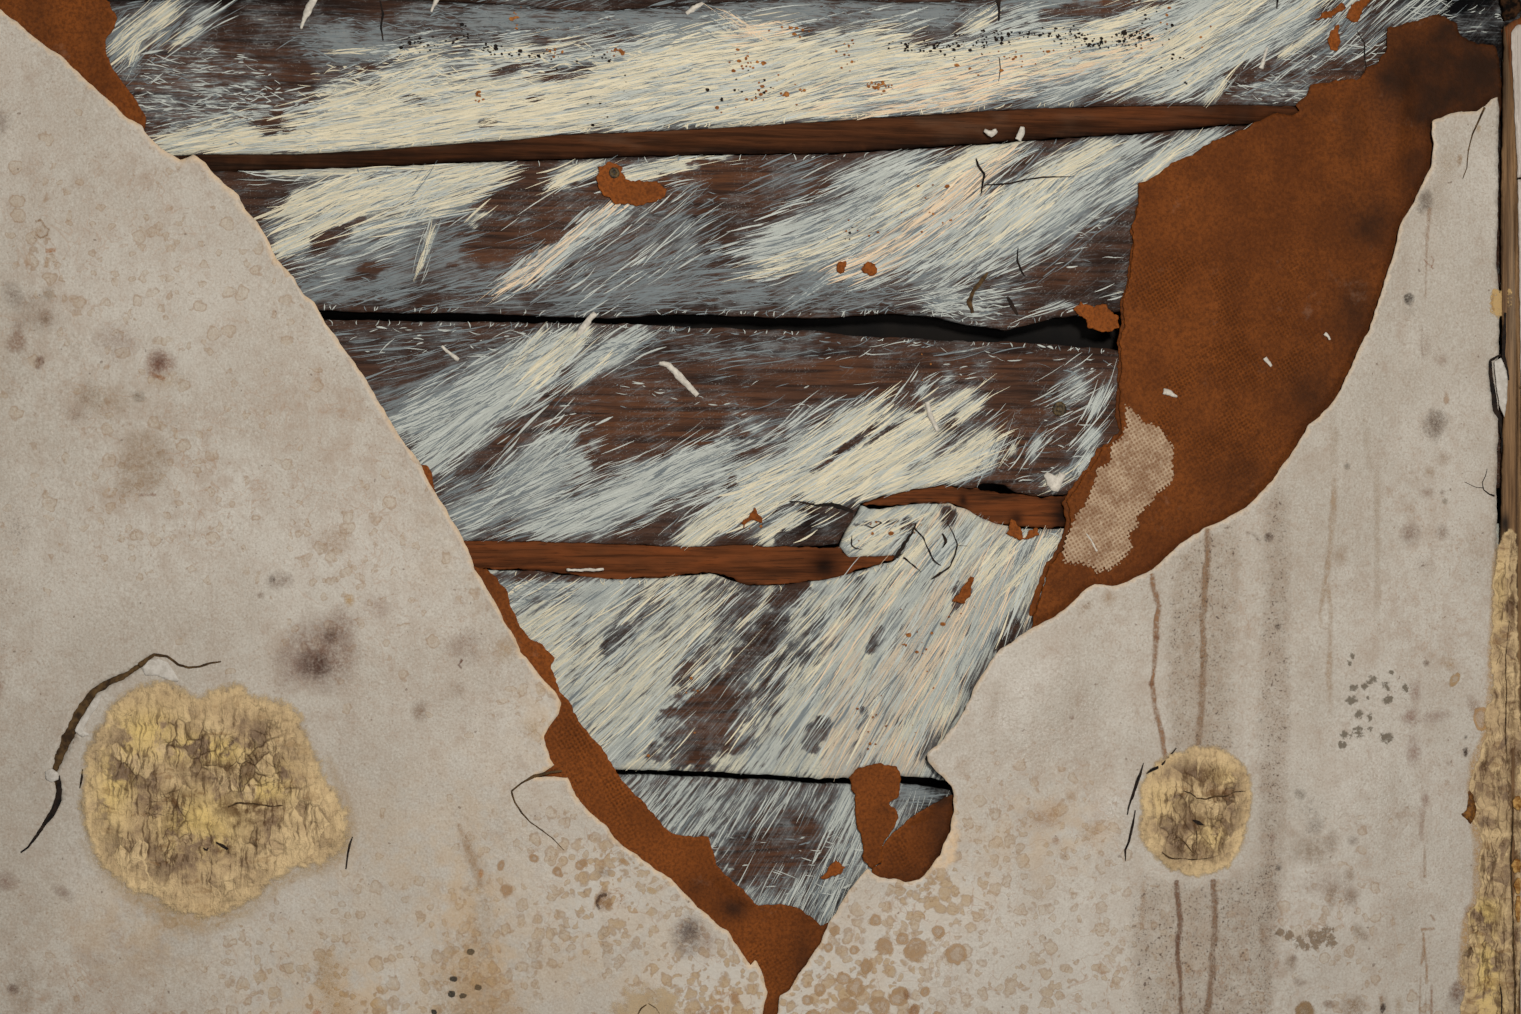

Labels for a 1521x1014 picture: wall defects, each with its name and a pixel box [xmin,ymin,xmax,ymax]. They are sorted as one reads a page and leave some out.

peeling [1062,404,1174,574]
crack [21,653,221,853]
peeling [78,681,348,919]
damp [498,861,512,896]
damp [530,854,587,877]
peeling [1139,745,1252,878]
mould [448,976,482,998]
damp [802,914,967,1014]